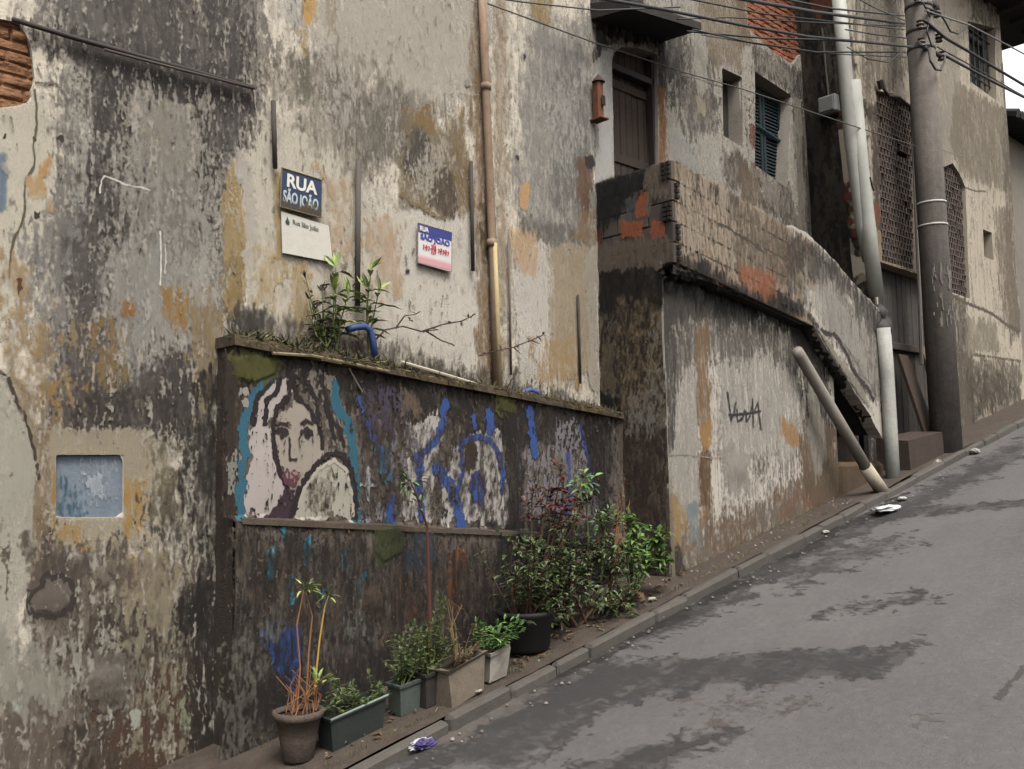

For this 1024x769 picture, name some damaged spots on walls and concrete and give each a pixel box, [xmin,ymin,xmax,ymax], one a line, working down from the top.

flaking render [0,21,33,108]
flaking render [747,0,800,63]
crack [8,82,58,278]
crack [0,370,41,480]
damp [0,0,810,769]